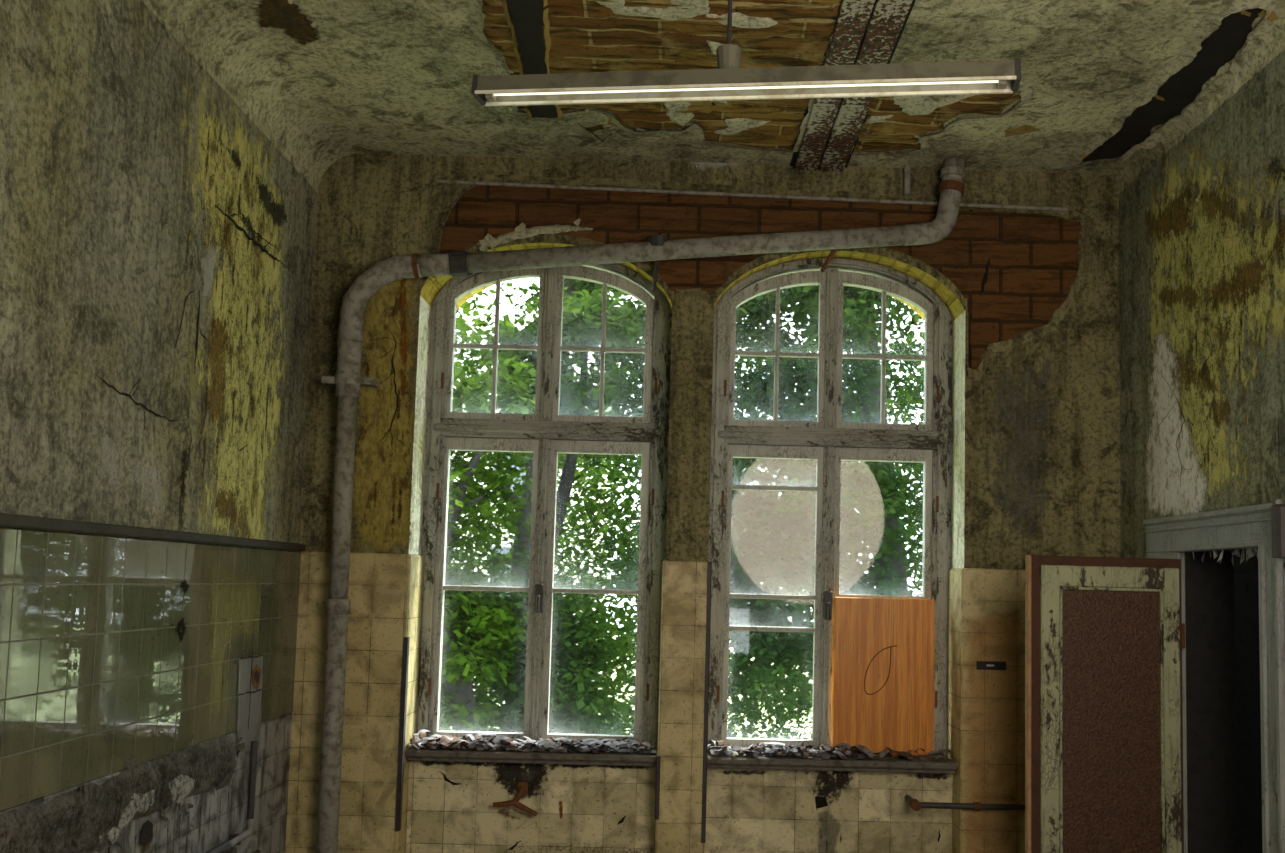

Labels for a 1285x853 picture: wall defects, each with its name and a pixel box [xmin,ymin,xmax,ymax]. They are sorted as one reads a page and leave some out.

peeling [256,0,330,55]
spalling [467,0,842,75]
spalling [850,81,1041,158]
crack [215,205,288,268]
spalling [429,98,939,254]
peeling [1146,176,1249,241]
spalling [629,200,1090,381]
peeling [1159,215,1285,432]
spalling [0,735,245,853]